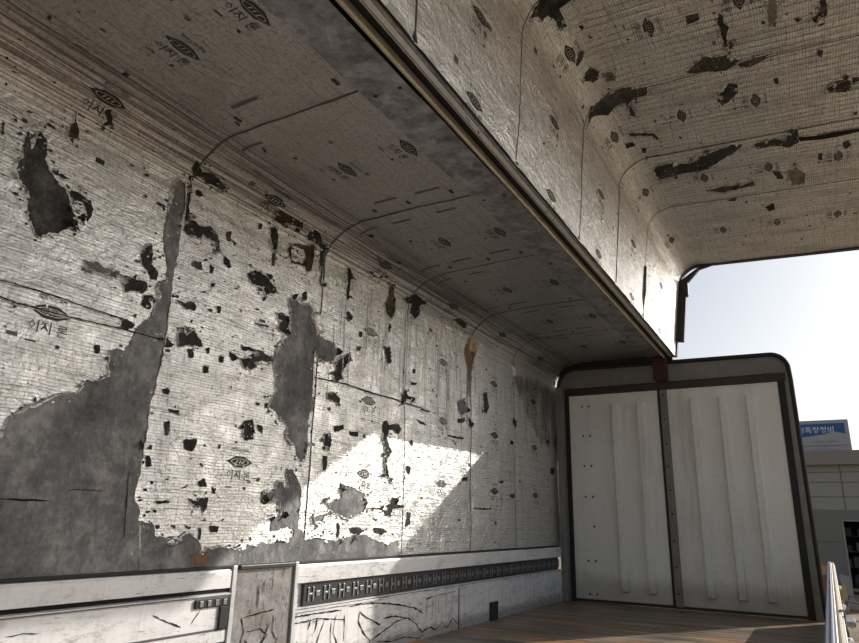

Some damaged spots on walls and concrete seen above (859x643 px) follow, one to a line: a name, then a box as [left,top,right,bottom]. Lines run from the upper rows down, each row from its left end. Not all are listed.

peeling [529,0,581,37]
peeling [685,10,772,107]
peeling [1,117,106,247]
peeling [62,108,115,148]
peeling [581,67,656,130]
peeling [625,132,666,153]
peeling [652,127,804,184]
peeling [0,157,413,579]
rust [464,336,478,396]
crack [295,591,457,643]